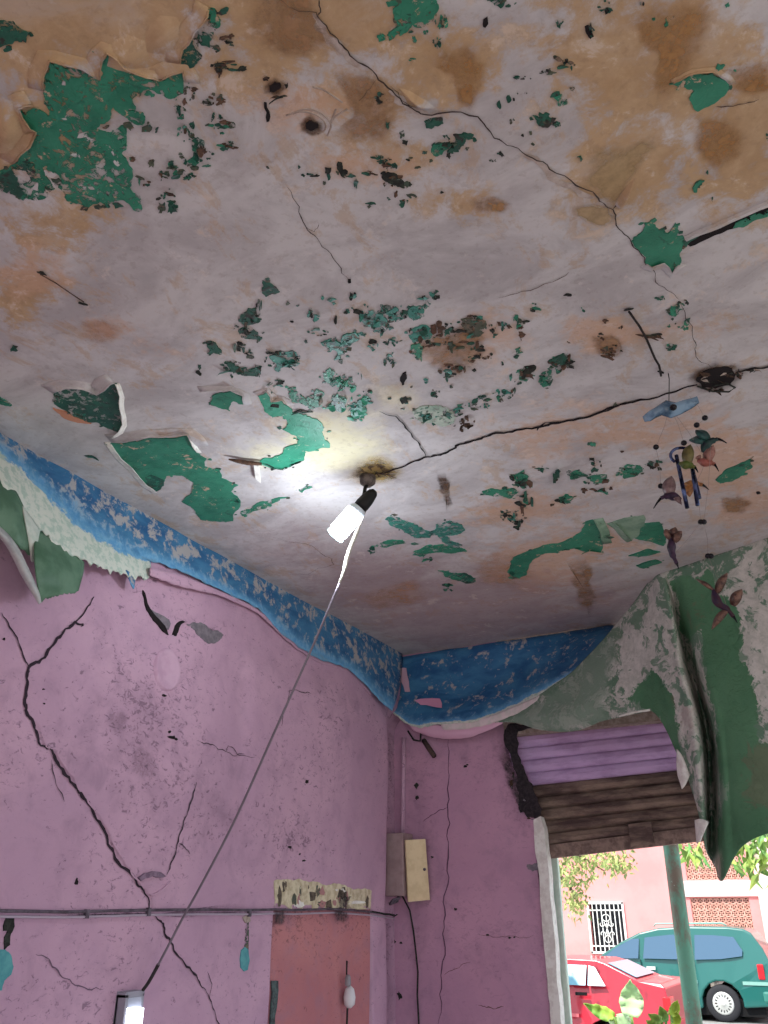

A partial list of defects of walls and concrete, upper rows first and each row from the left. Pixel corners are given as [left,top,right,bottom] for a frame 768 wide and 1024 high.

peeling [0,0,247,214]
crack [281,0,709,474]
peeling [632,218,686,277]
crack [682,201,768,247]
peeling [41,278,575,522]
crack [736,365,768,373]
peeling [0,433,768,881]
crack [2,597,219,1024]
peeling [274,879,372,910]